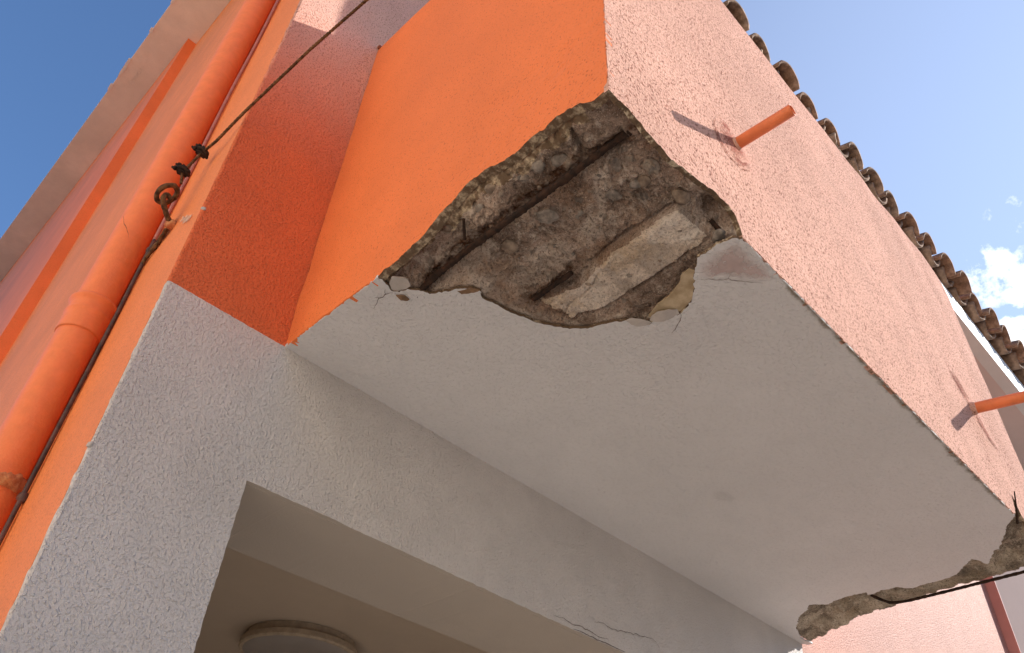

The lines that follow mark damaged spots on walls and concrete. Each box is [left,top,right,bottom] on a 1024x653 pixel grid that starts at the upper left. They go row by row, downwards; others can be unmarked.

spalling [385,99,737,326]
spalling [797,491,1024,641]